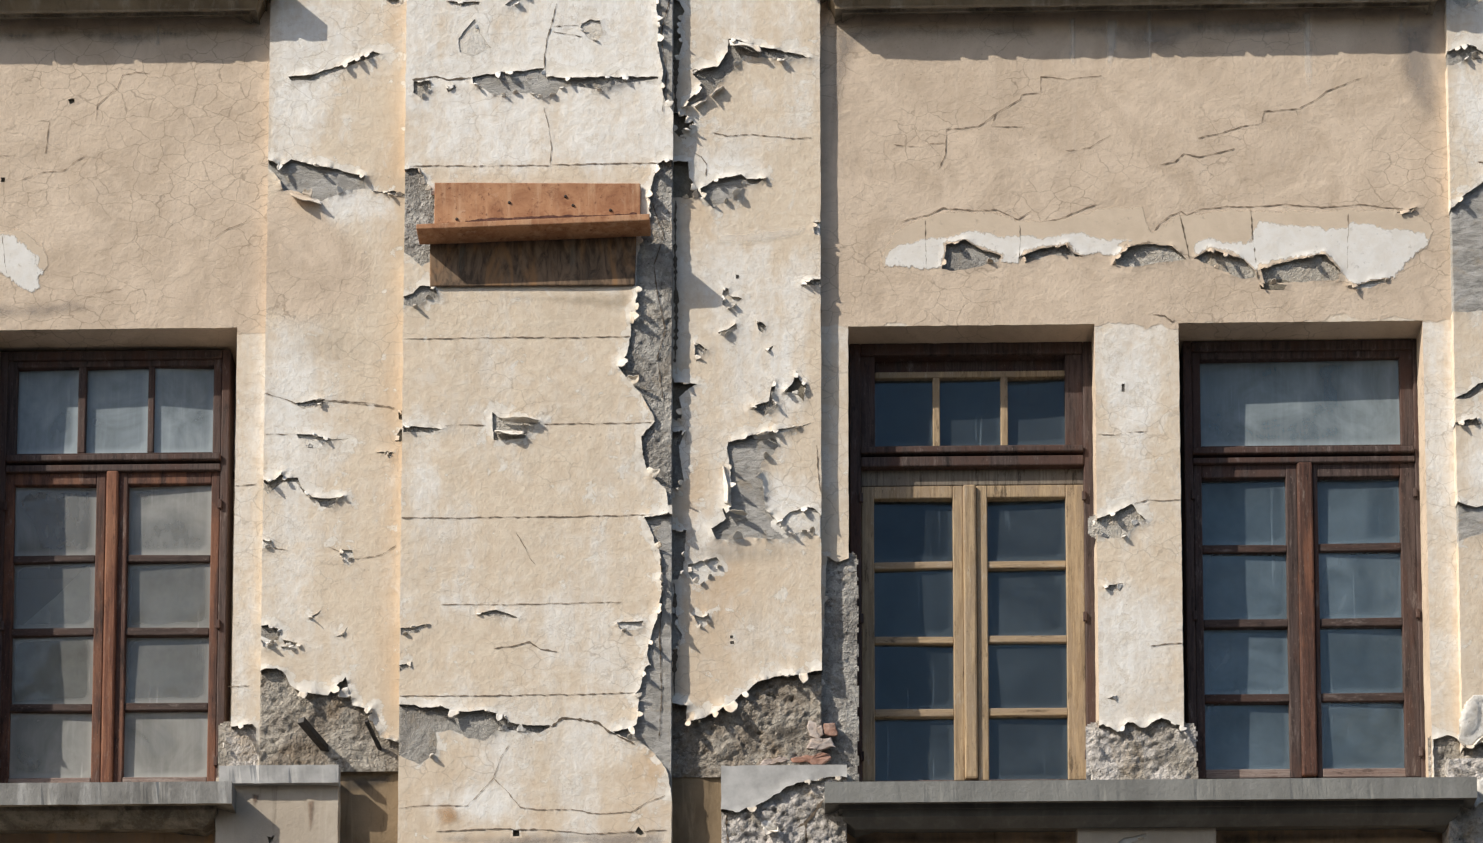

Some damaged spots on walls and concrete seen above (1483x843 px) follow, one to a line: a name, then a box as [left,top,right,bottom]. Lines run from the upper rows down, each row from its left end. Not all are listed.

crack [3,120,87,180]
crack [894,75,1102,170]
crack [1161,78,1361,165]
spalling [268,160,435,266]
crack [902,204,1096,261]
peeling [881,182,1483,312]
crack [1155,204,1404,278]
spalling [611,159,859,843]
spalling [1456,502,1483,543]
spalling [218,668,550,778]
spalling [1086,718,1198,780]
spalling [1428,735,1483,781]